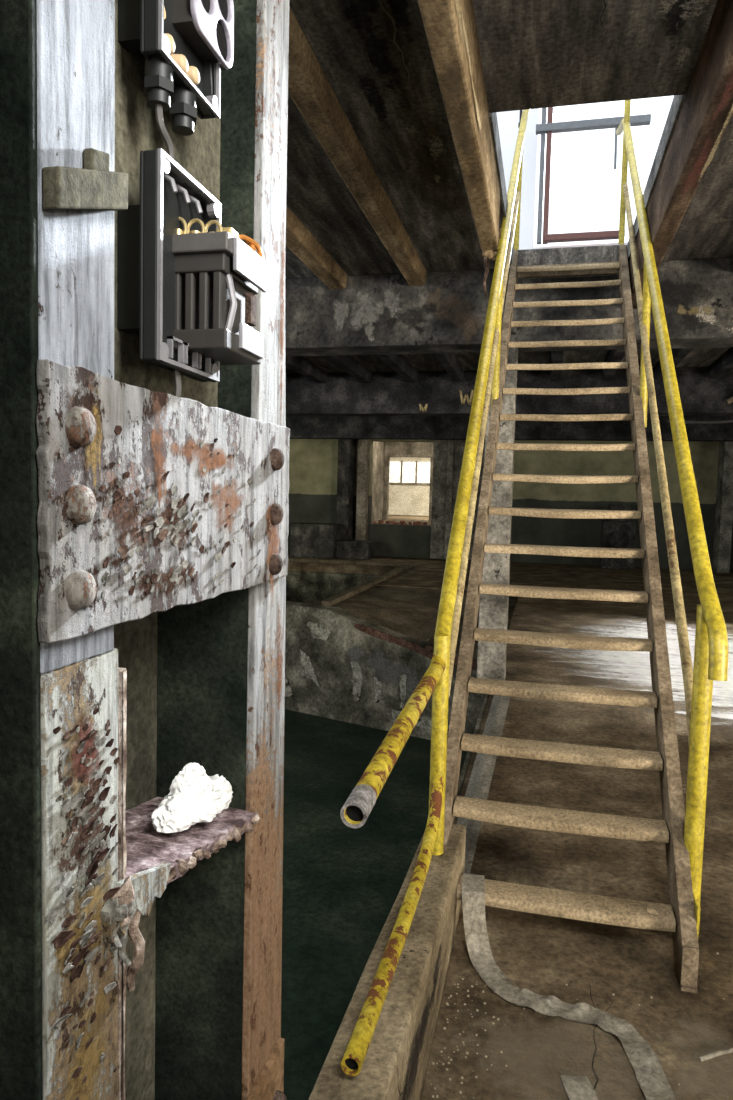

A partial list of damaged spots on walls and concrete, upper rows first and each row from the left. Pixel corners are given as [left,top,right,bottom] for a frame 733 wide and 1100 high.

water stain [455,0,481,130]
water stain [665,0,694,48]
water stain [334,289,402,341]
water stain [683,308,708,331]
corrosion [86,406,102,491]
corrosion [151,429,226,516]
corrosion [267,509,280,599]